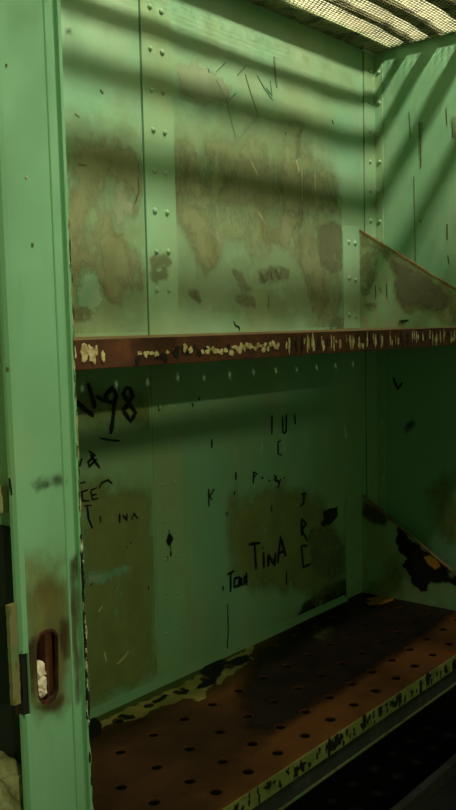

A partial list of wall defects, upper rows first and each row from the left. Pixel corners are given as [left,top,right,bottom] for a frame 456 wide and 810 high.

peeling [178,62,229,103]
peeling [175,136,342,322]
peeling [135,236,456,365]
peeling [68,140,255,738]
rust [27,557,80,709]
peeling [396,524,456,591]
peeling [233,659,456,810]